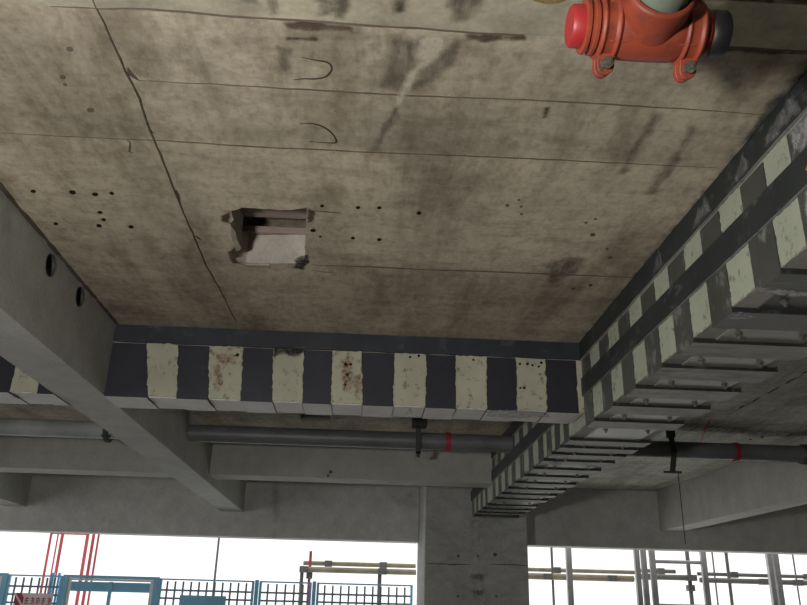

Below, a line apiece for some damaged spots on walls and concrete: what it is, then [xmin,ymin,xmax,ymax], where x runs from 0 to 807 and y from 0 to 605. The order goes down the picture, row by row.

leakage [386,36,458,113]
crack [0,0,775,324]
spalling [221,213,270,268]
spalling [295,255,309,270]